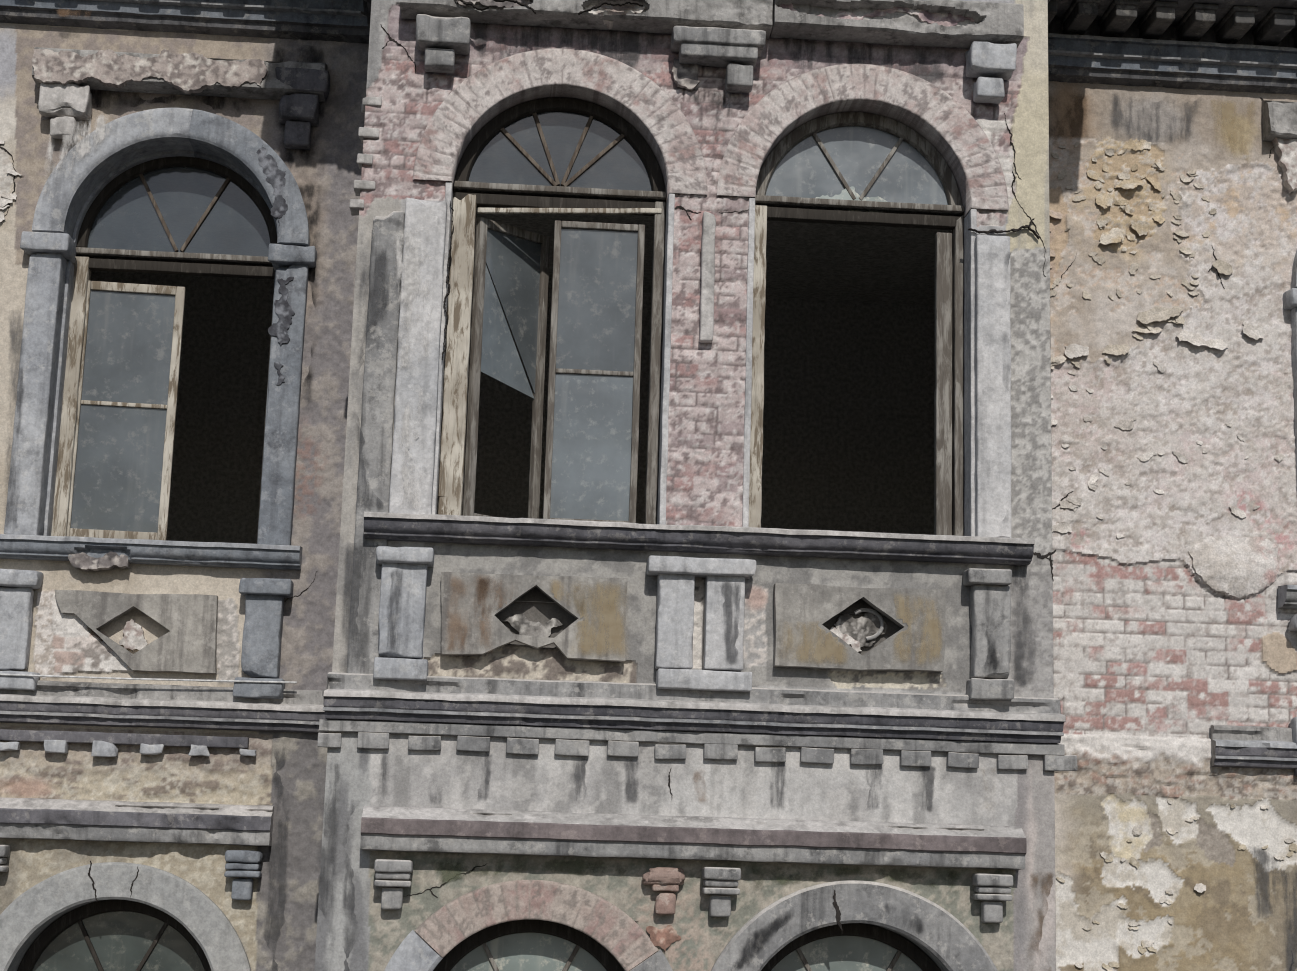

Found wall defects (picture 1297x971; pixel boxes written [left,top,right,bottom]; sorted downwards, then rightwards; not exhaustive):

crack [380,24,416,73]
flaking render [0,140,22,224]
crack [968,113,1077,290]
flaking render [349,0,1030,527]
spalling [68,551,131,571]
crack [1033,550,1056,581]
flaking render [1049,136,1297,971]
flaking render [34,589,132,678]
crack [88,861,98,902]
crack [833,890,843,931]